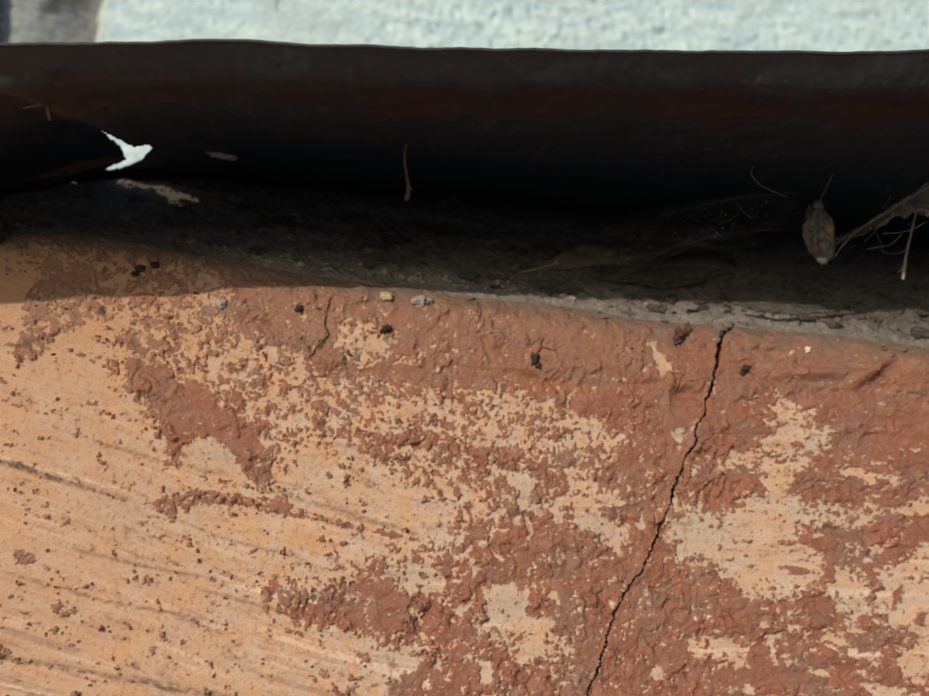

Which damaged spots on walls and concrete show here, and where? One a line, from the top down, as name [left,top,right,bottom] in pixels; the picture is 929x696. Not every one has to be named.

peeling [0,233,646,696]
peeling [649,665,665,680]
peeling [647,340,673,375]
crack [586,264,859,696]
peeling [663,397,929,696]